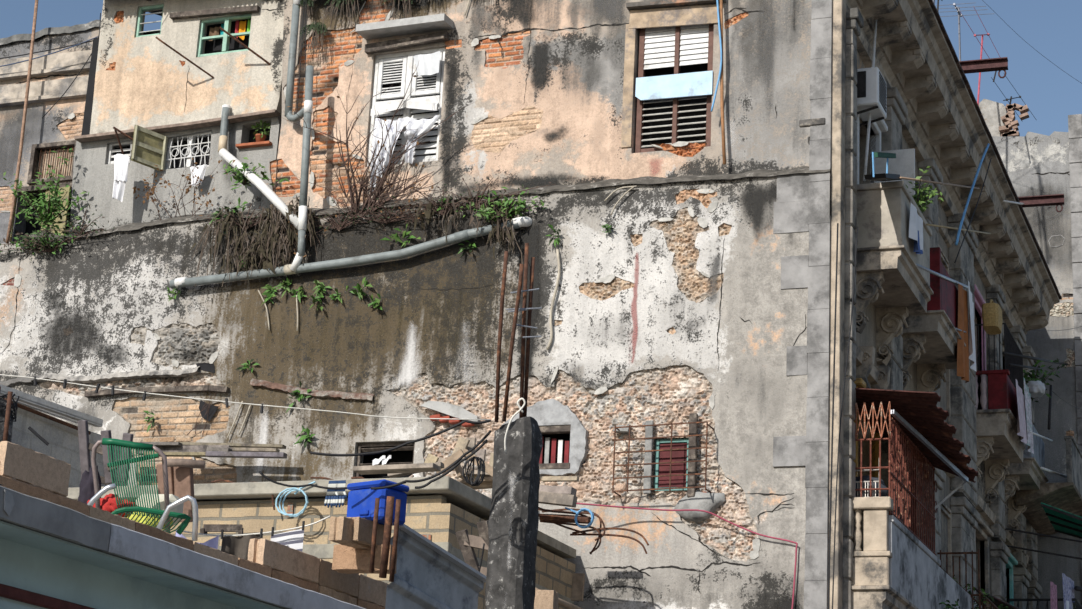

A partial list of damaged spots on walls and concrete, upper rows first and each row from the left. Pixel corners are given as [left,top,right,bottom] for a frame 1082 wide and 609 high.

flaking render [445,29,531,68]
flaking render [270,0,393,208]
flaking render [470,105,543,153]
leakage [442,64,576,193]
flaking render [0,186,13,213]
spalling [630,189,732,303]
spalling [579,274,635,301]
leakage [46,292,126,362]
leakage [398,331,417,384]
spalling [389,365,760,562]
crack [587,514,755,594]
leakage [774,596,799,609]